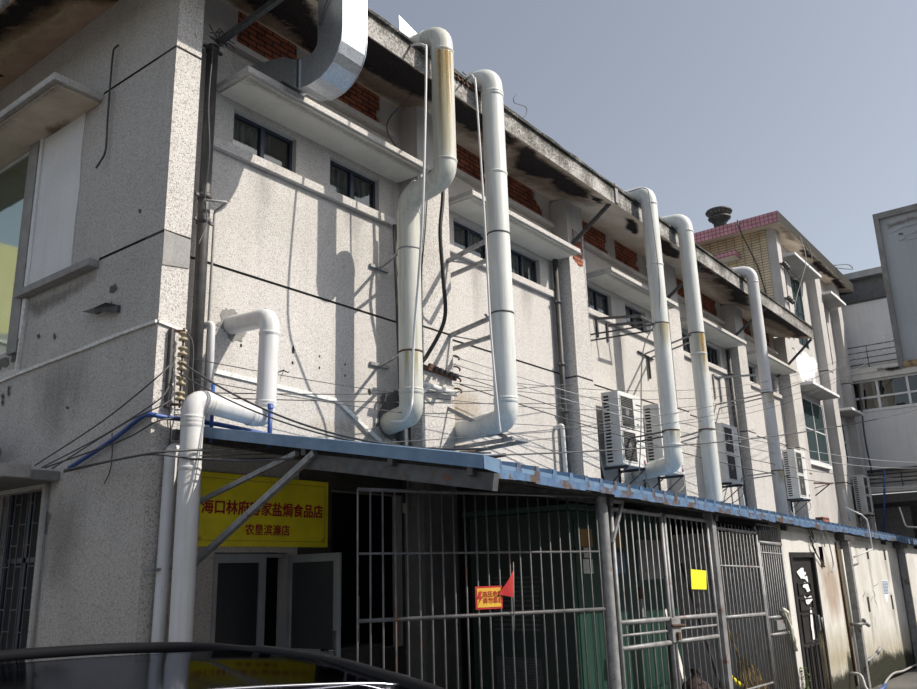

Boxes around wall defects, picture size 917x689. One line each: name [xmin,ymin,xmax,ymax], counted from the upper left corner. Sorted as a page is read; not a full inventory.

leakage [0,0,82,64]
flaking render [237,11,296,60]
leakage [233,0,318,53]
flaking render [337,82,380,123]
leakage [455,97,483,140]
flaking render [456,144,485,183]
leakage [505,132,602,203]
flaking render [507,175,550,220]
flaking render [572,220,639,271]
peeling [795,348,817,382]
leakage [832,655,859,689]
leakage [868,649,916,688]